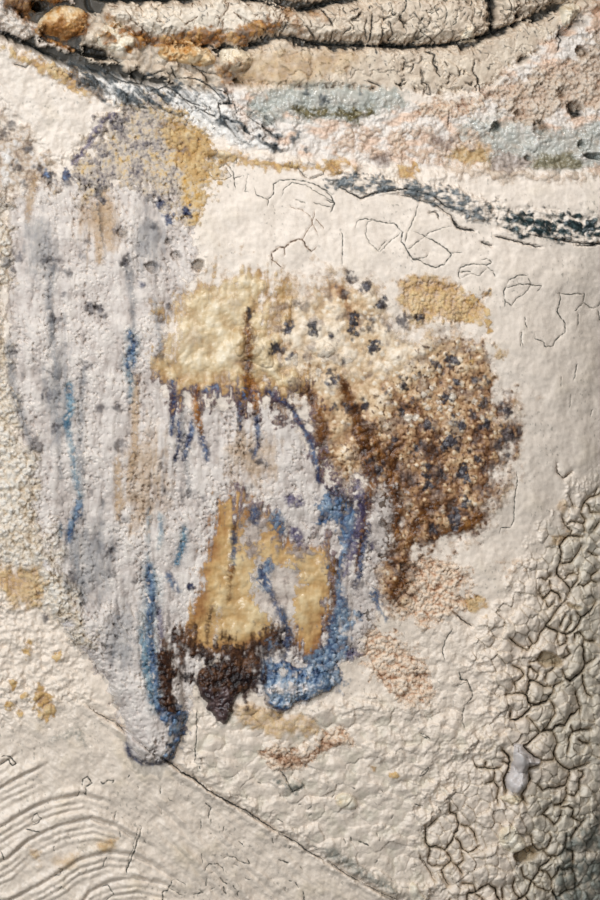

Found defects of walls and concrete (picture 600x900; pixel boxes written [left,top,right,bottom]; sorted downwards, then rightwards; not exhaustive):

crack [0,31,53,68]
corrosion [4,0,90,52]
crack [74,49,271,135]
corrosion [100,14,281,54]
crack [86,0,561,95]
crack [210,159,600,347]
damp [64,383,83,541]
damp [126,265,522,766]
damp [0,568,45,606]
damp [4,679,56,722]
crack [415,465,599,900]
crack [90,708,397,900]